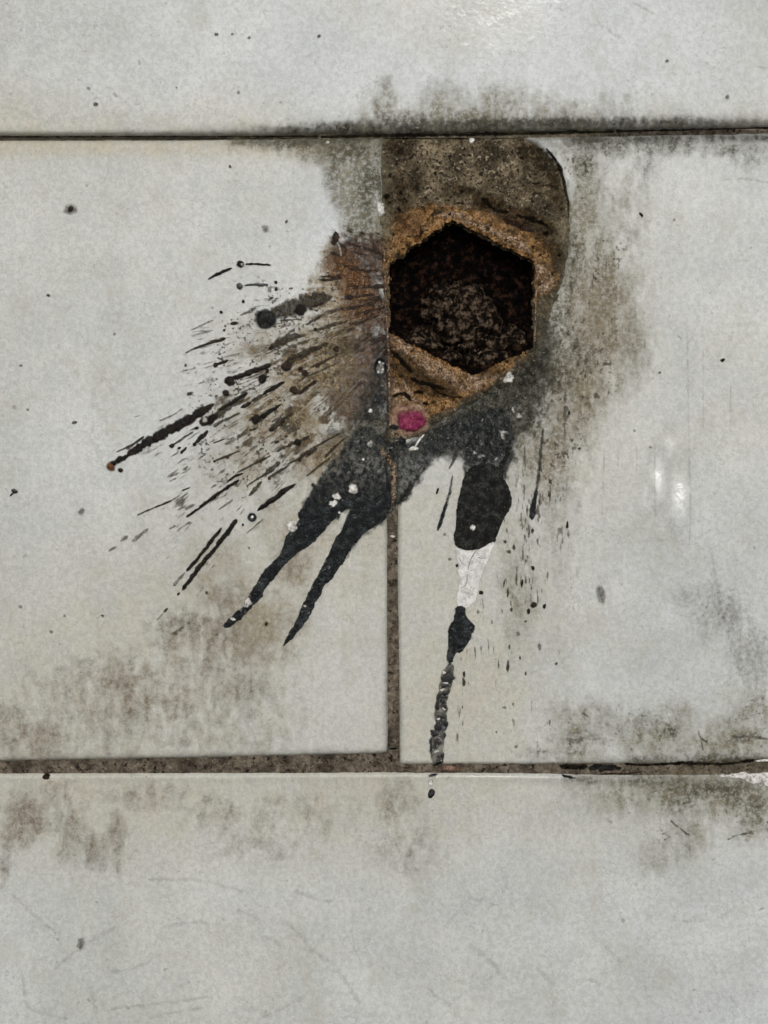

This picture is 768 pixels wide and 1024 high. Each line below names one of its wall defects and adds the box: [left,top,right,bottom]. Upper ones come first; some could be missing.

water stain [274,96,692,622]